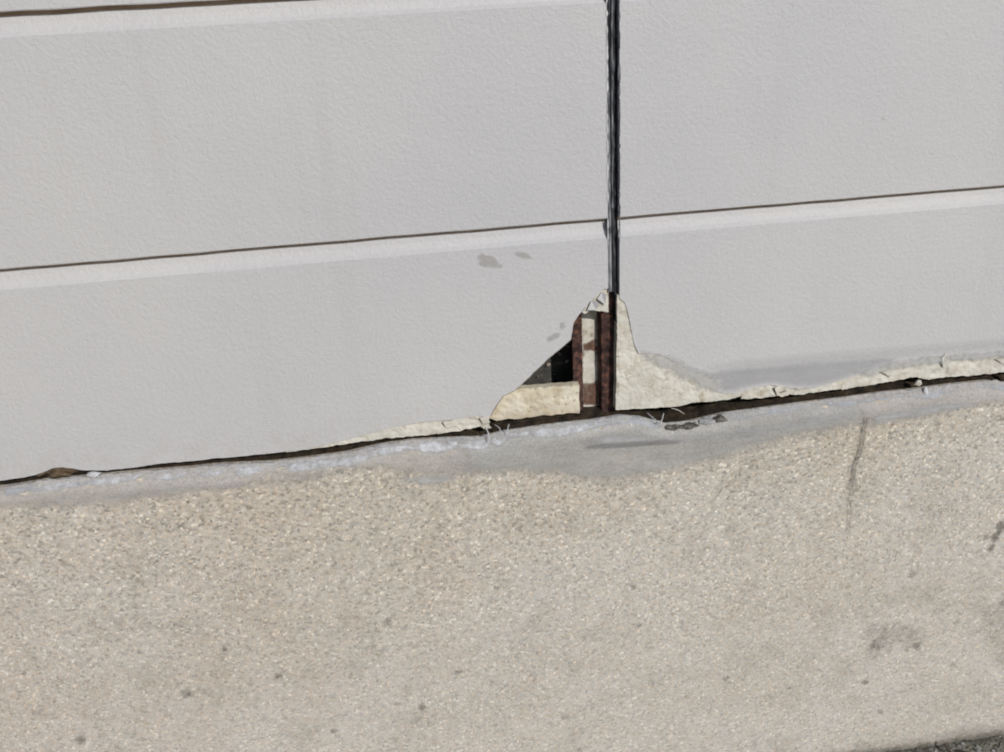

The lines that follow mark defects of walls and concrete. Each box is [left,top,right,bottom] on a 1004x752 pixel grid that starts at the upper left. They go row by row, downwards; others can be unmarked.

corrosion [584,340,597,351]
peeling [286,289,1004,452]